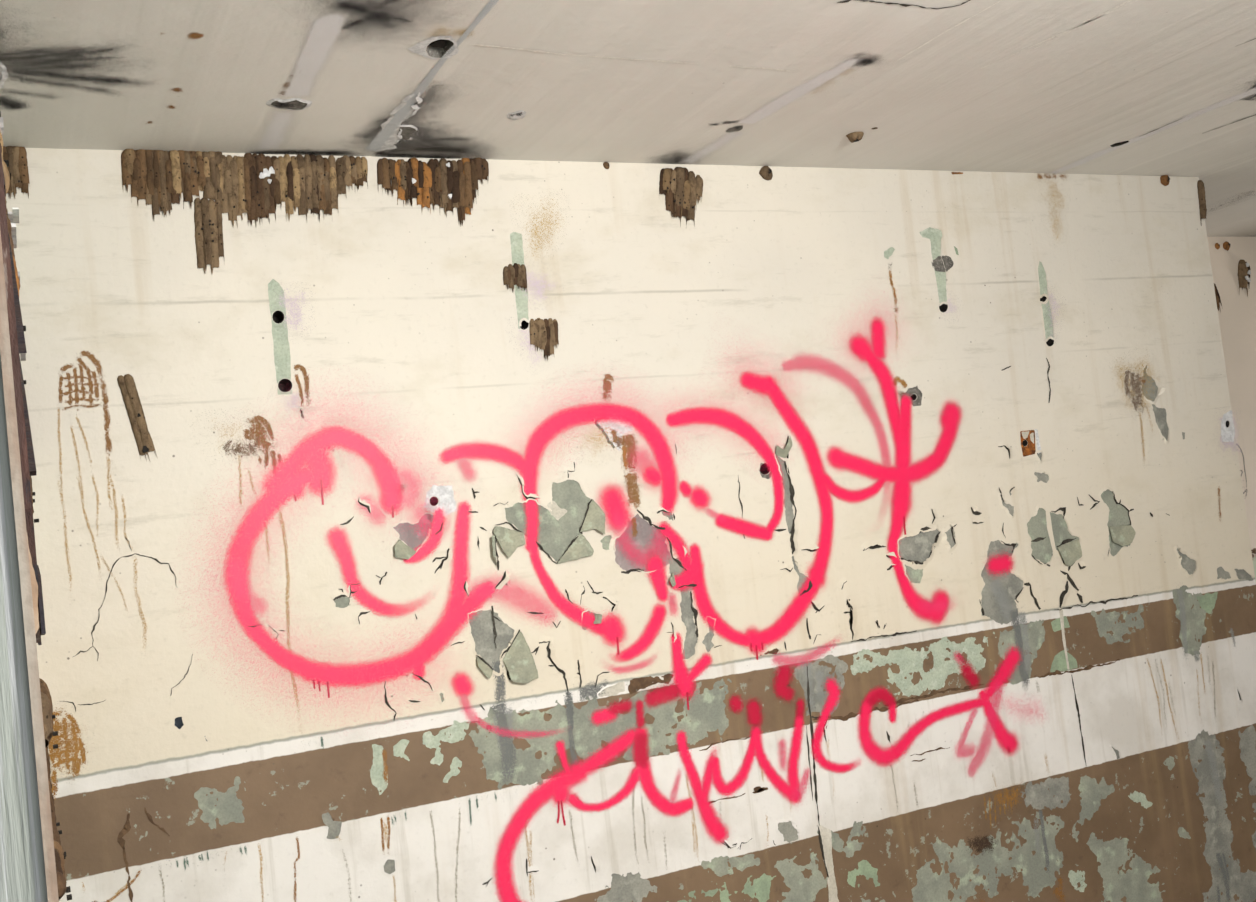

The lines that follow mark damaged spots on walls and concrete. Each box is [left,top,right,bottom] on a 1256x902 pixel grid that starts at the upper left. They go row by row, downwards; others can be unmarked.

crack [837,0,970,9]
corrosion [1124,370,1153,461]
corrosion [57,351,148,648]
crack [73,537,177,661]
peeling [467,606,538,683]
peeling [492,476,717,662]
peeling [794,489,1083,716]
peeling [1098,486,1136,556]
peeling [370,673,732,795]
peeling [595,818,827,902]
peeling [911,775,1165,902]
peeling [1188,725,1256,902]